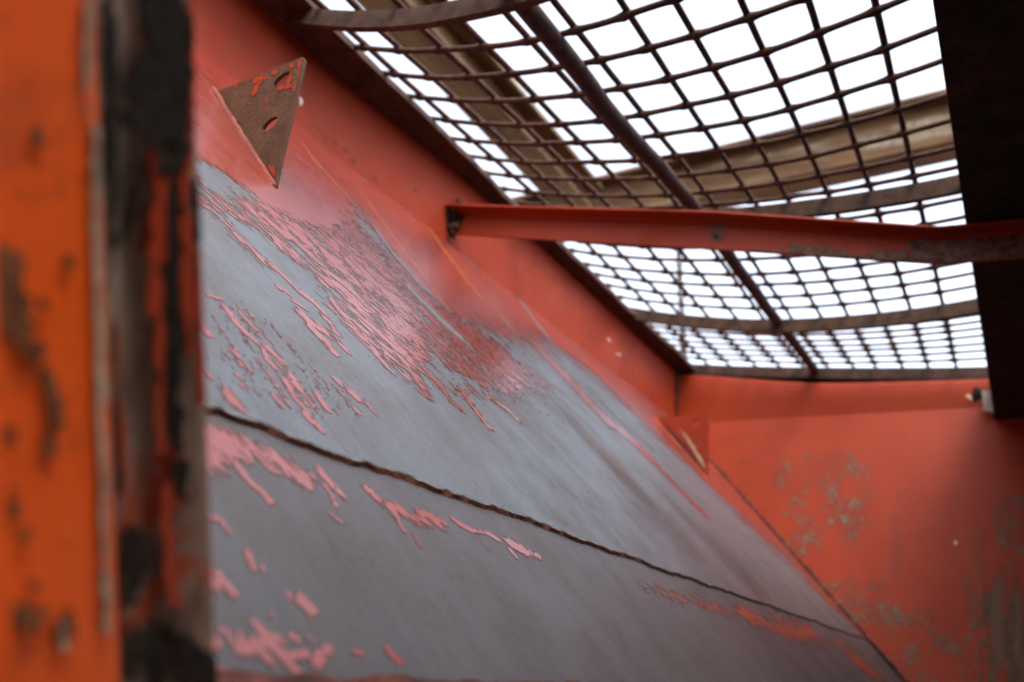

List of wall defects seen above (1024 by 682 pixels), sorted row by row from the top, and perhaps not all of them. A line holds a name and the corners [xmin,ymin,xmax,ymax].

peeling [146,45,712,526]
peeling [159,483,183,609]
peeling [212,567,238,601]
peeling [244,547,265,574]
peeling [284,592,318,621]
peeling [359,483,543,561]
peeling [214,611,335,674]